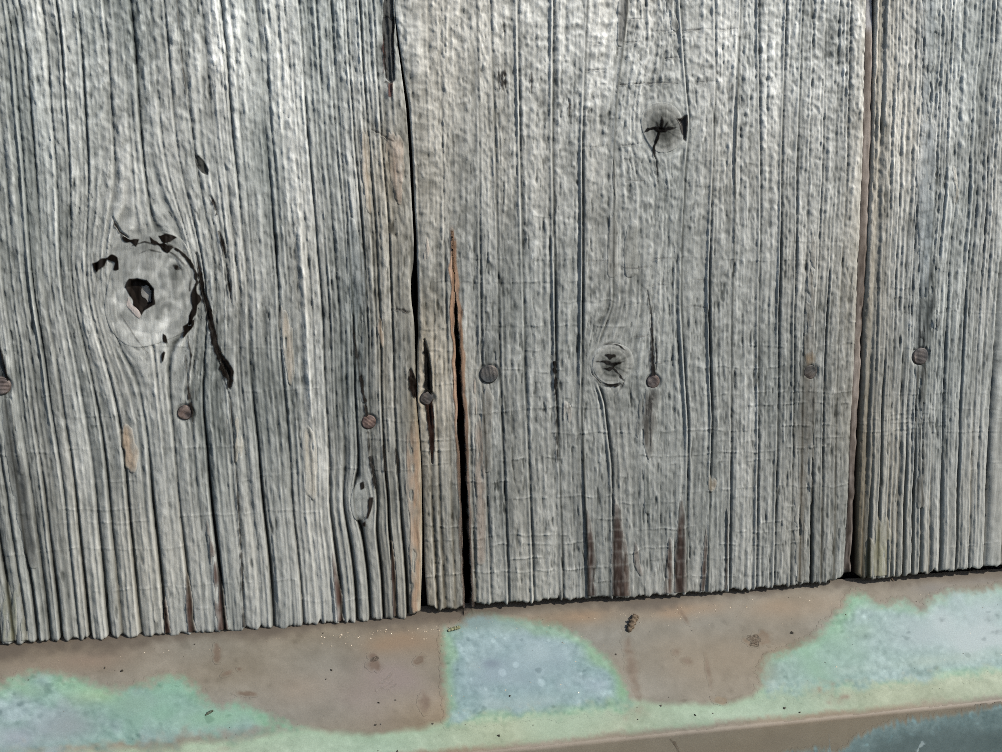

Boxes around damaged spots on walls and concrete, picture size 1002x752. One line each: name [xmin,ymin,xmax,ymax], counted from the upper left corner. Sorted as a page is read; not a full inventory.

crack [176,0,187,92]
crack [633,117,676,181]
crack [113,197,234,422]
crack [408,231,472,609]
crack [234,450,245,627]